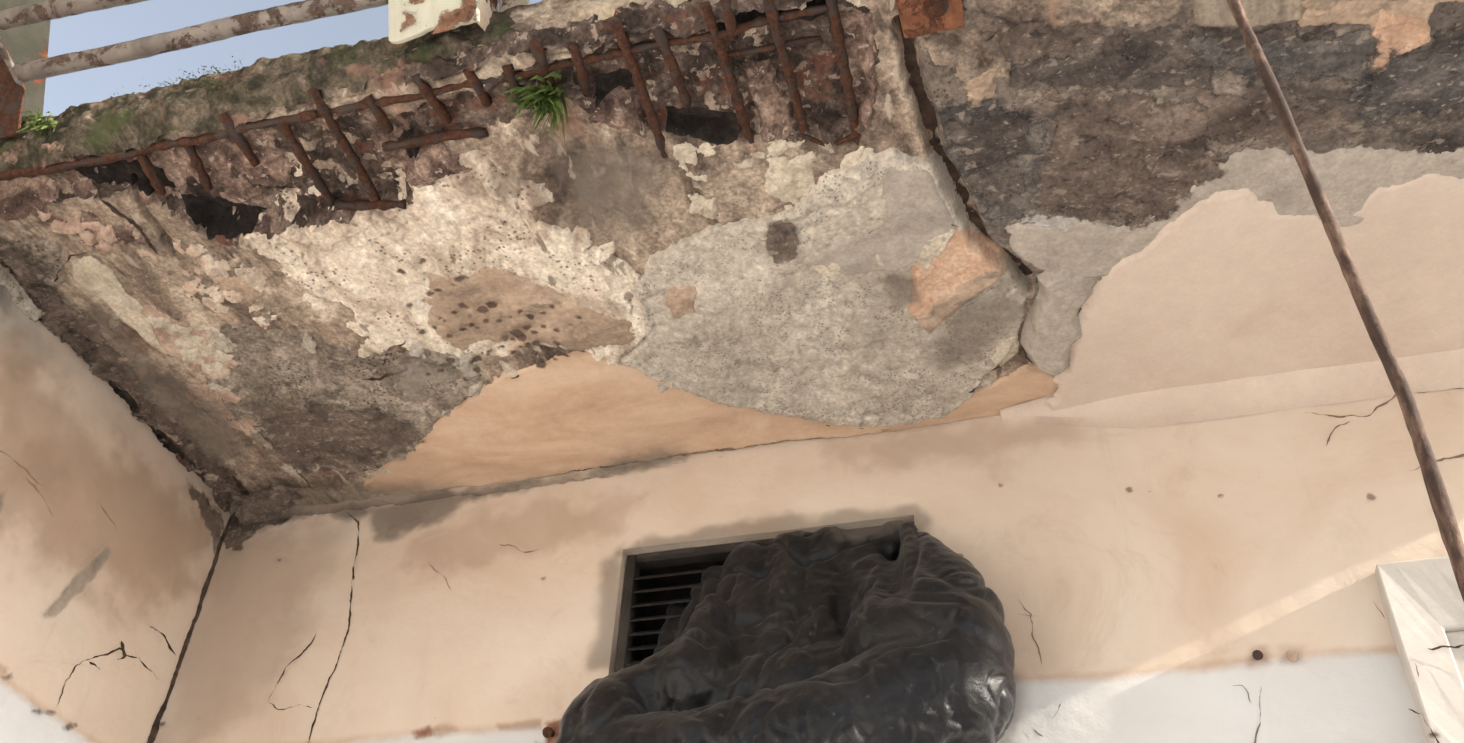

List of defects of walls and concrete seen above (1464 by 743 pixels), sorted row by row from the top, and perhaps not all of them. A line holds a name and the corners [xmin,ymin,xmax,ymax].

flaking render [921,0,1185,108]
flaking render [1298,0,1464,75]
peeling [1207,137,1254,164]
peeling [1338,131,1378,149]
flaking render [0,0,1059,492]
spalling [107,380,250,516]
leakage [0,238,678,554]
crack [1306,388,1464,446]
crack [1411,454,1464,471]
leakage [46,549,110,616]
crack [58,511,236,743]
crack [268,516,360,743]